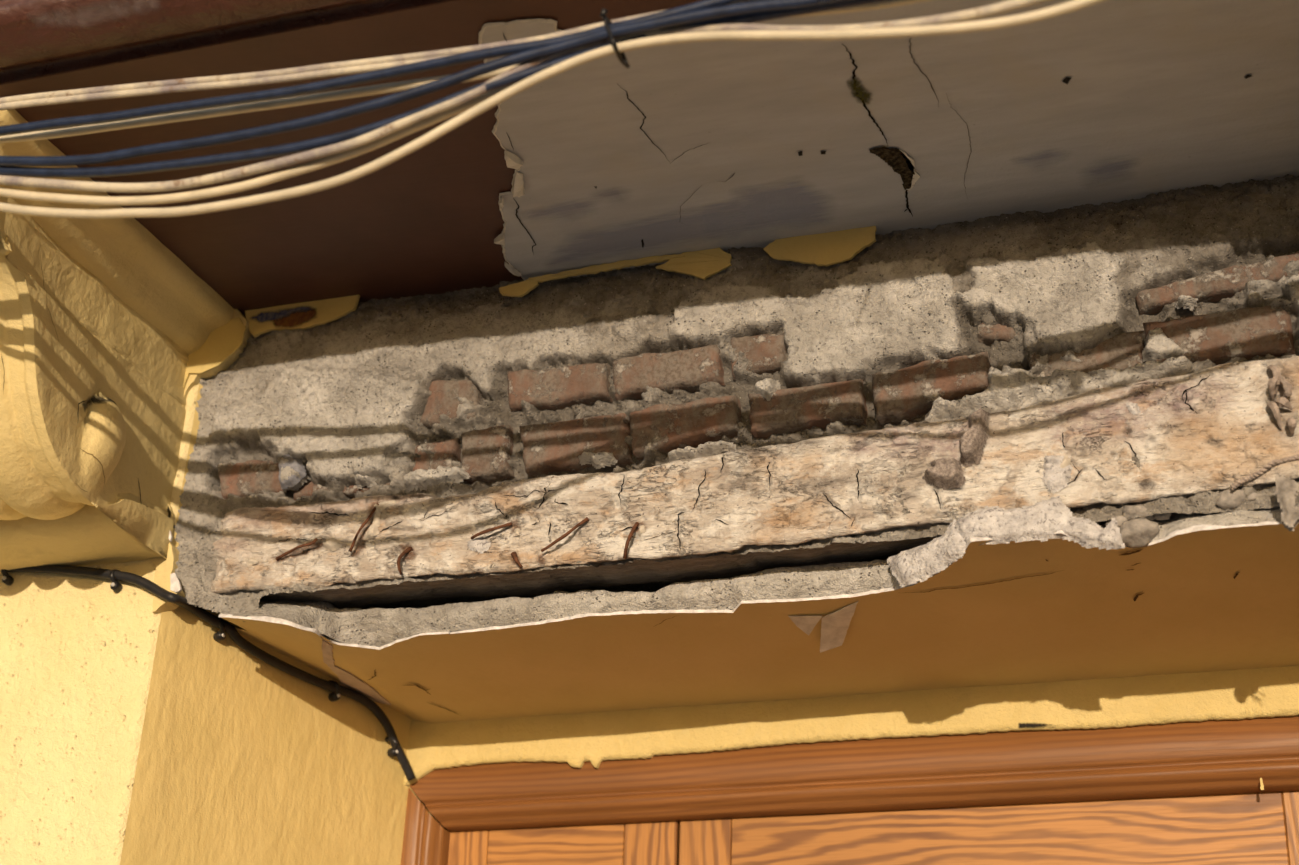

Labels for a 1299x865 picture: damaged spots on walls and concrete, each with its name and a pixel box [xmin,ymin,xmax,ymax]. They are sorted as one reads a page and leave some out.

crack [842,44,888,145]
crack [904,191,913,217]
corrosion [273,309,316,327]
spalling [148,0,1299,705]
crack [618,457,729,552]
crack [824,468,859,526]